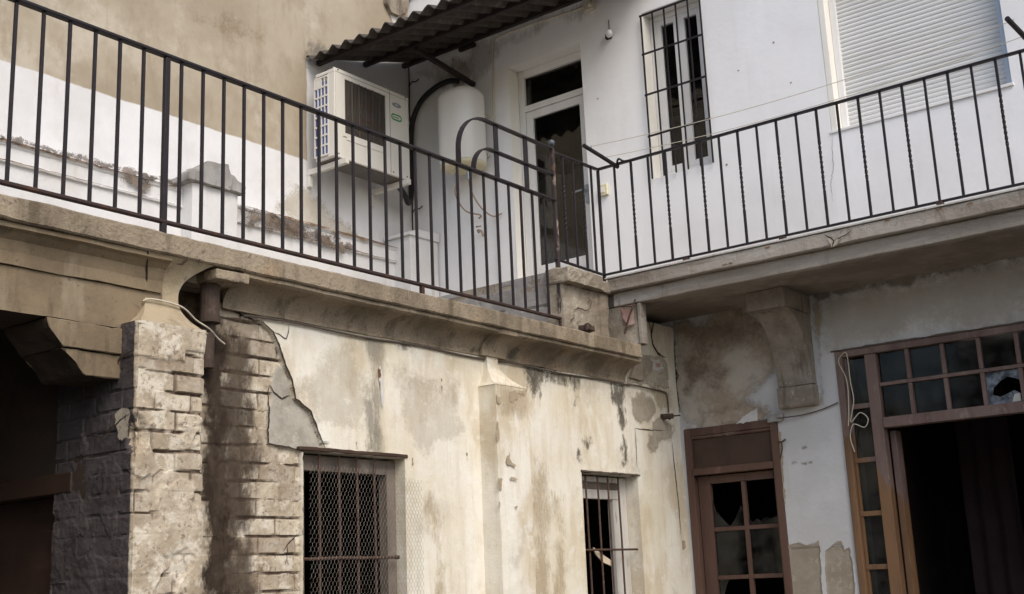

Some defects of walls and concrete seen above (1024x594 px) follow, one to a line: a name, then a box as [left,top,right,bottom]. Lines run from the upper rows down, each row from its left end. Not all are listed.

spalling [115,408,130,440]
water stain [367,336,384,449]
water stain [524,366,581,406]
water stain [610,382,629,467]
flaking render [632,391,673,452]
crack [635,318,681,529]
flaking render [736,408,784,424]
water stain [201,330,261,594]
flaking render [788,539,855,594]